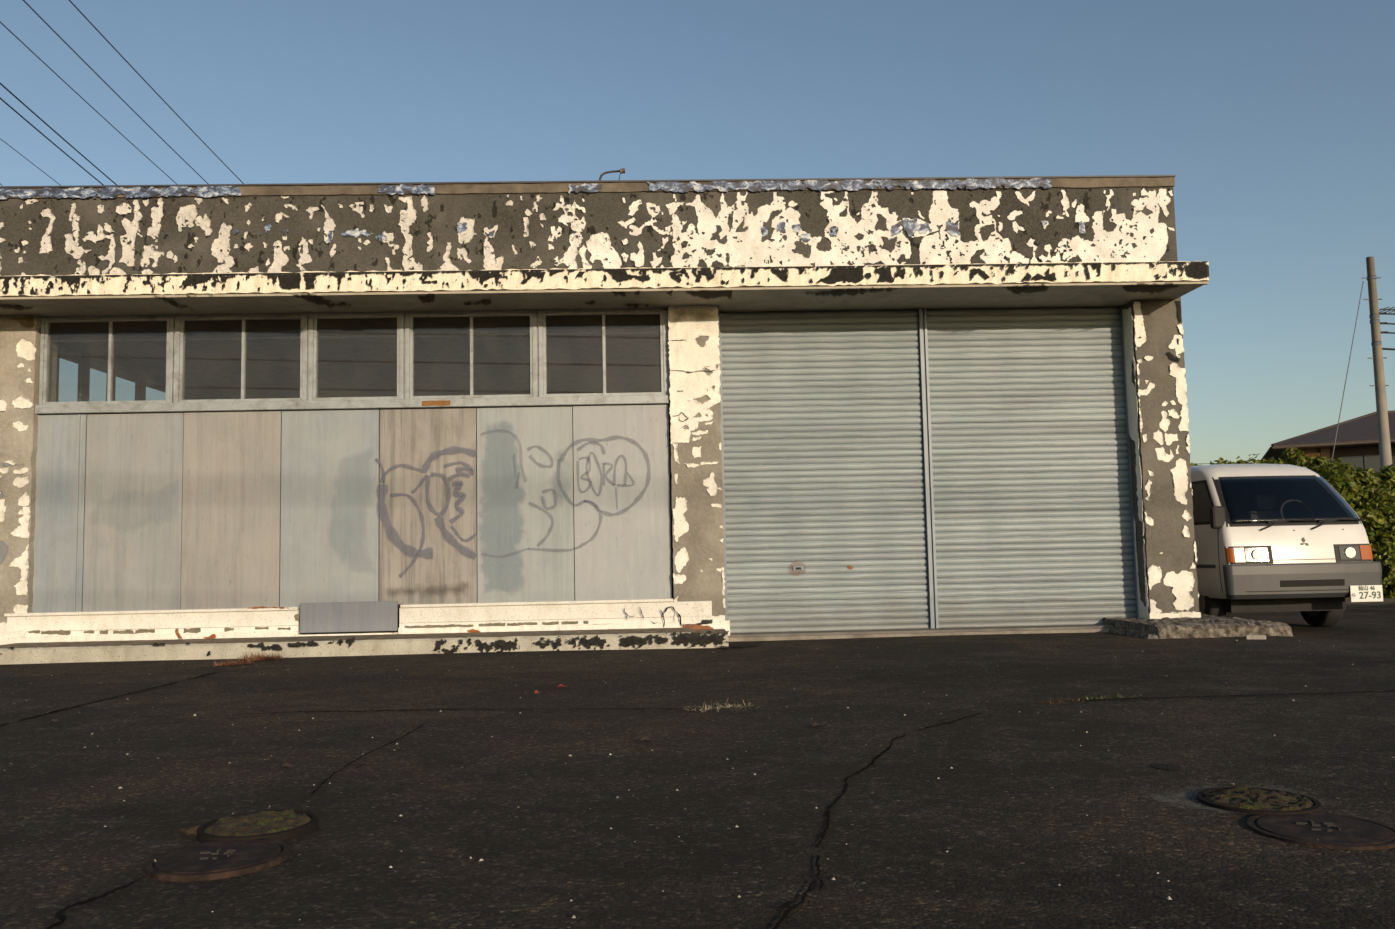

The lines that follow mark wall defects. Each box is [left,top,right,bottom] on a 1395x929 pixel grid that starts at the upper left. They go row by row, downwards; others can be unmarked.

peeling [0,178,1174,276]
peeling [0,339,36,432]
peeling [0,460,155,638]
peeling [668,305,726,630]
peeling [1122,301,1199,613]